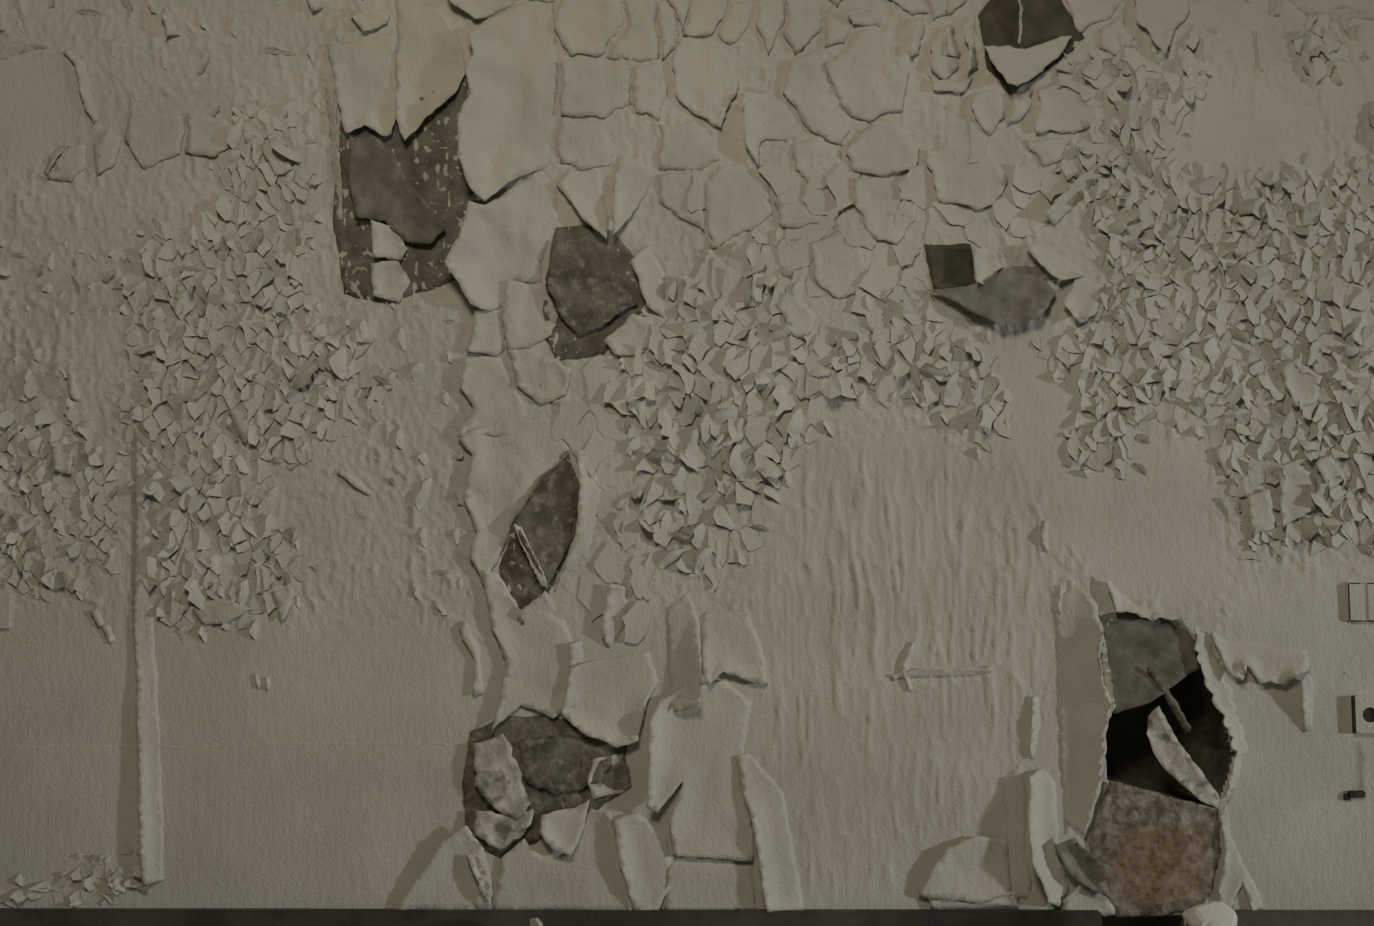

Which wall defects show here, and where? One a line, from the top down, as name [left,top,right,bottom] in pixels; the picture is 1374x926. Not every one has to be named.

peeling [0,96,399,908]
peeling [314,0,1374,917]
crack [553,0,1190,343]